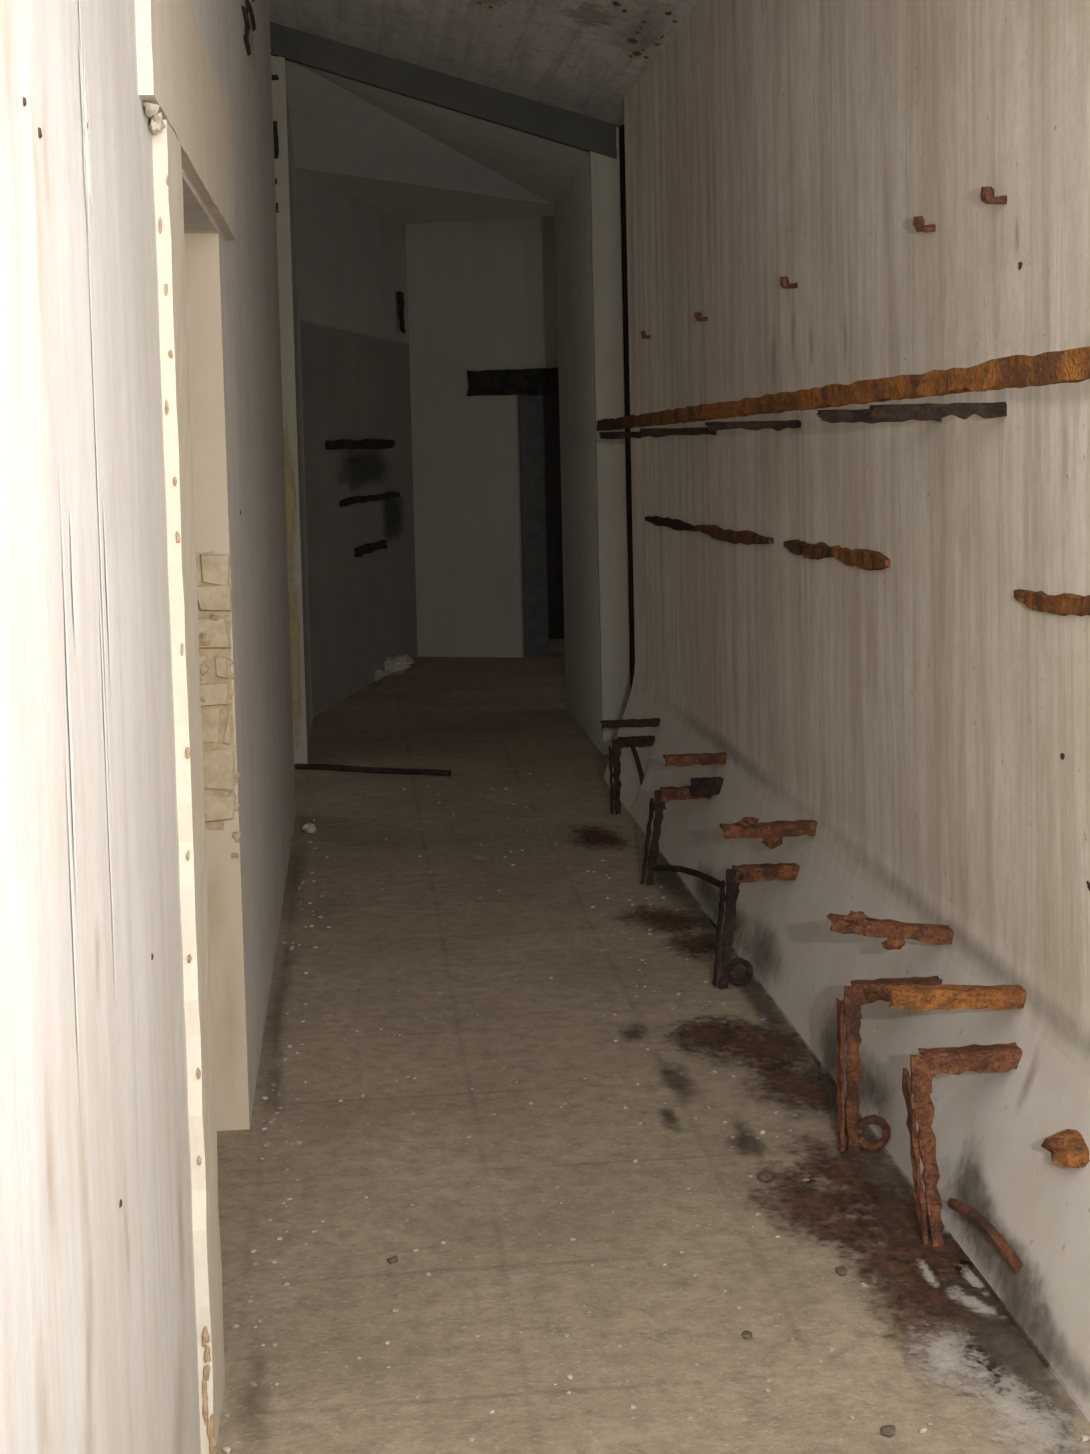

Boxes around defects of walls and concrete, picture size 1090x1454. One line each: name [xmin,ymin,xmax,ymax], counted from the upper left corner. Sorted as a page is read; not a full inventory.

rust [670,1018,836,1110]
rust [751,1137,1048,1362]